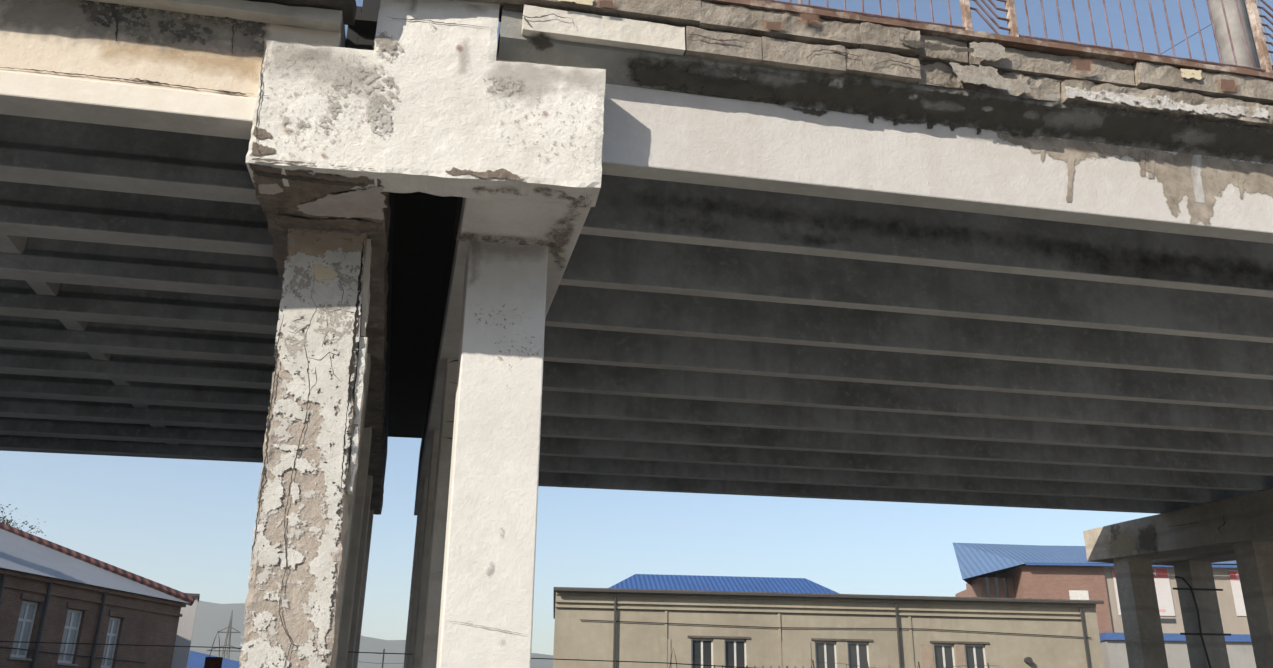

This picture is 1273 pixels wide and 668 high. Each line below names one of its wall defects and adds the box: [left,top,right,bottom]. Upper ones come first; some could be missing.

leakage [0,0,266,73]
leakage [533,33,553,50]
spalling [900,39,1031,93]
peeling [1181,69,1202,80]
spalling [1065,86,1273,120]
peeling [503,104,590,160]
leakage [629,58,1273,226]
spalling [446,167,525,181]
peeling [239,31,403,668]
crack [252,241,364,667]